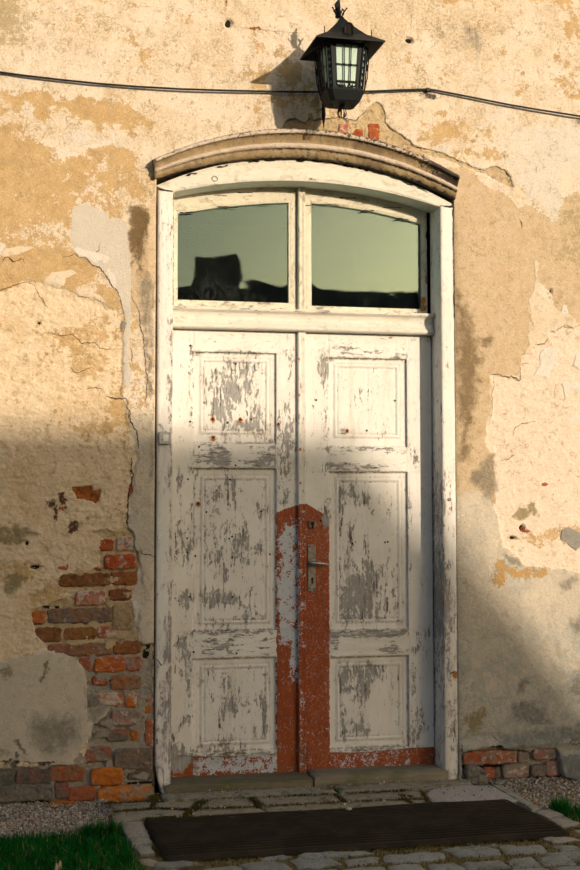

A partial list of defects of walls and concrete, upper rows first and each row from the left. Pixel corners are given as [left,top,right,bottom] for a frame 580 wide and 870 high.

flaking render [283,102,424,156]
flaking render [483,165,520,192]
crack [0,257,46,306]
flaking render [43,270,76,289]
flaking render [71,202,132,391]
flaking render [524,260,580,399]
crack [63,245,148,527]
flaking render [69,486,101,504]
flaking render [0,526,154,811]
flaking render [461,746,572,787]